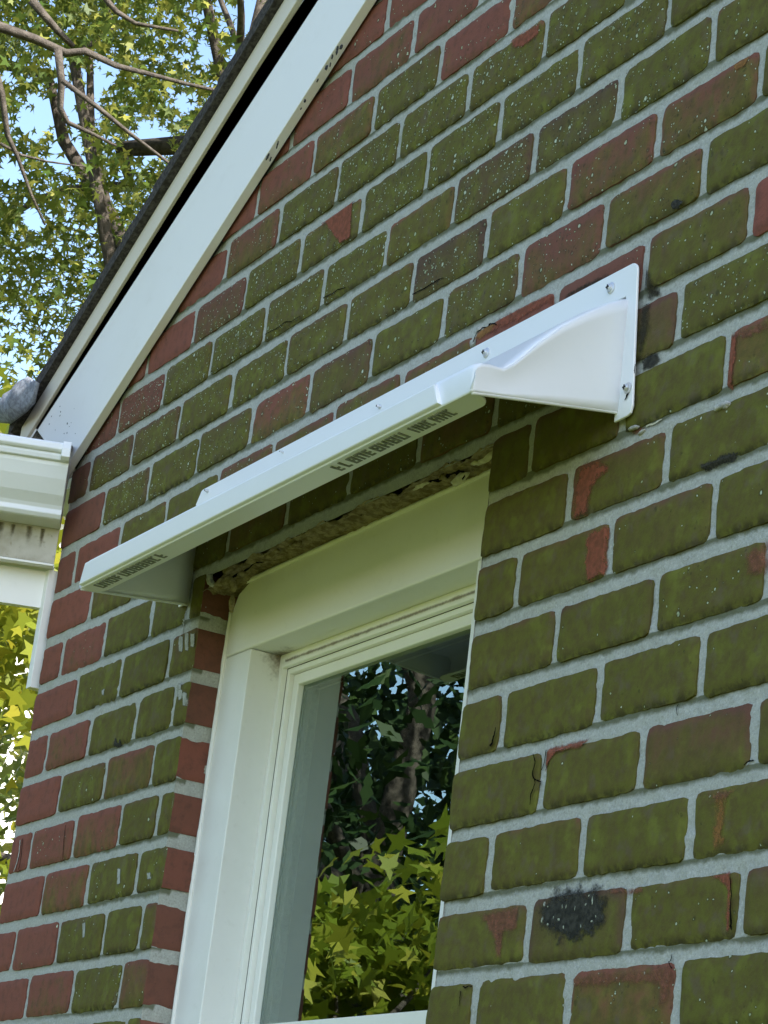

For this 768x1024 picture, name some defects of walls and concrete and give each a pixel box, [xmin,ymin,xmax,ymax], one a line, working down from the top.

spalling [202,443,494,613]
crack [530,751,546,803]
leakage [539,884,607,945]